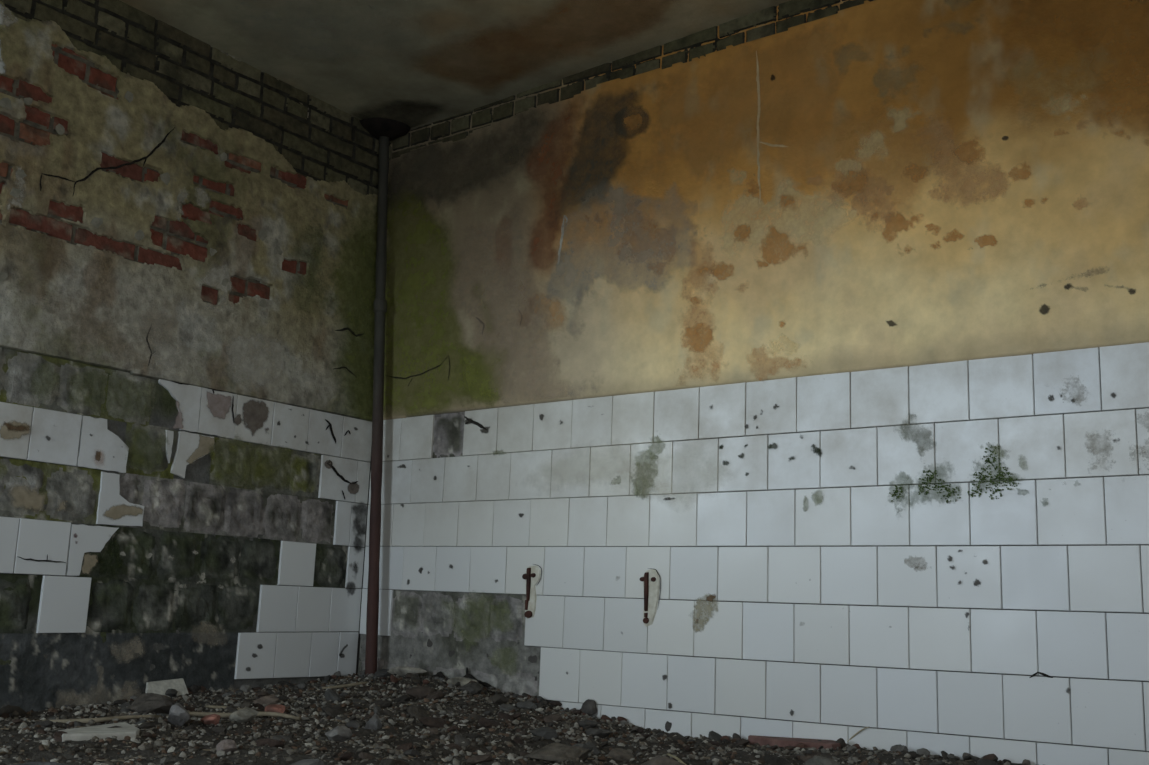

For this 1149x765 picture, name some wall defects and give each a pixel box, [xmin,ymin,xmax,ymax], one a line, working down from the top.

spalling [0,0,875,210]
crack [40,127,175,195]
spalling [0,162,307,275]
damp [388,114,544,202]
damp [555,91,683,289]
peeling [757,227,805,267]
spalling [201,277,270,308]
peeling [0,347,663,737]
spalling [794,738,1031,765]